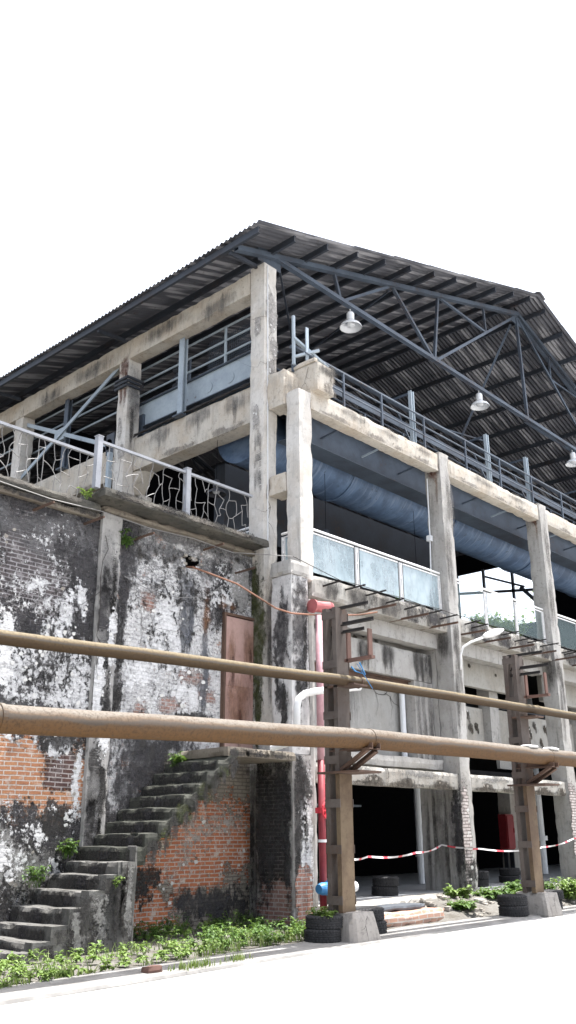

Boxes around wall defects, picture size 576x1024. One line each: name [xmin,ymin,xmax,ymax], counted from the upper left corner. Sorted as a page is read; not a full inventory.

spalling [0,505,100,641]
peeling [0,548,252,715]
leakage [0,485,309,724]
rust [230,638,252,720]
flaking render [0,734,110,913]
leakage [0,735,313,960]
flaking render [133,764,326,935]
spalling [353,774,514,890]